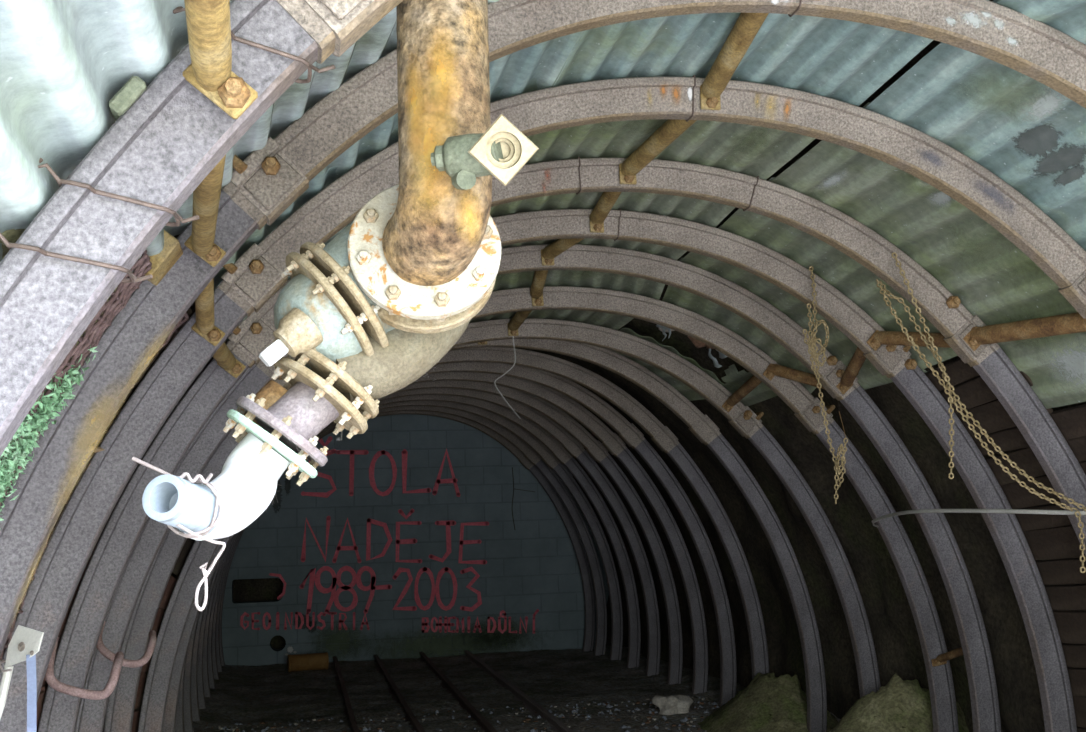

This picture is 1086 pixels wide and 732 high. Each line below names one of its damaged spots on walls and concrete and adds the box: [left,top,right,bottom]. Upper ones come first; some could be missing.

leakage [1012,93,1086,186]